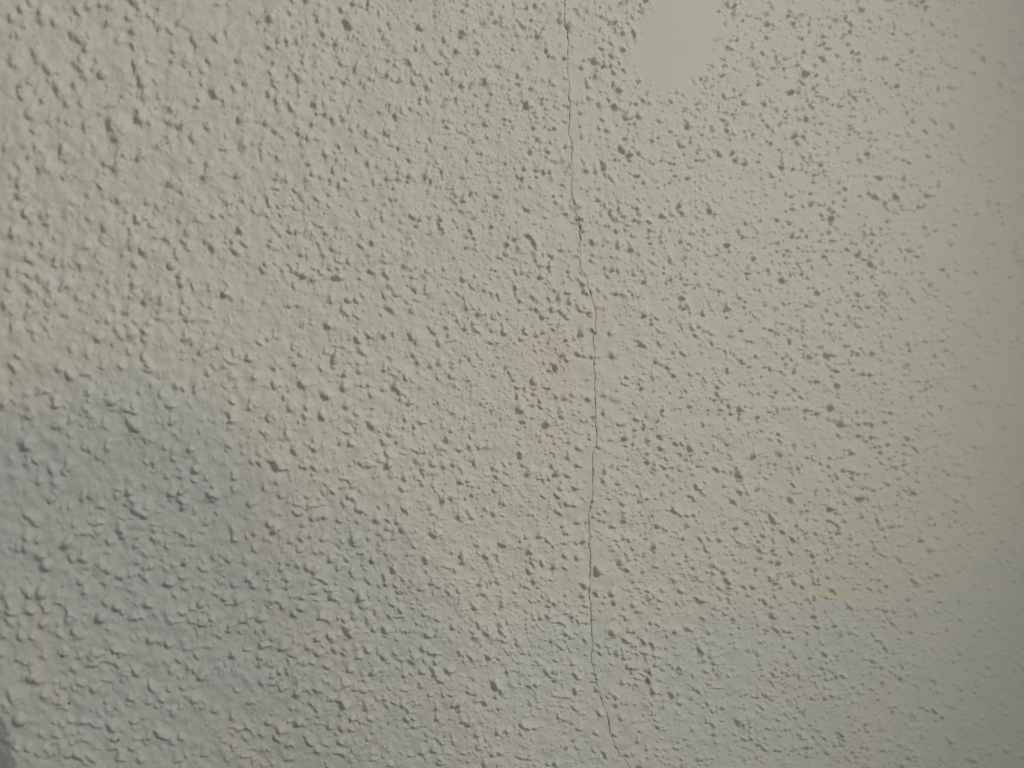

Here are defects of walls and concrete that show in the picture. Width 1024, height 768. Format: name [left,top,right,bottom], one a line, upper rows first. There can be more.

crack [561,0,630,767]